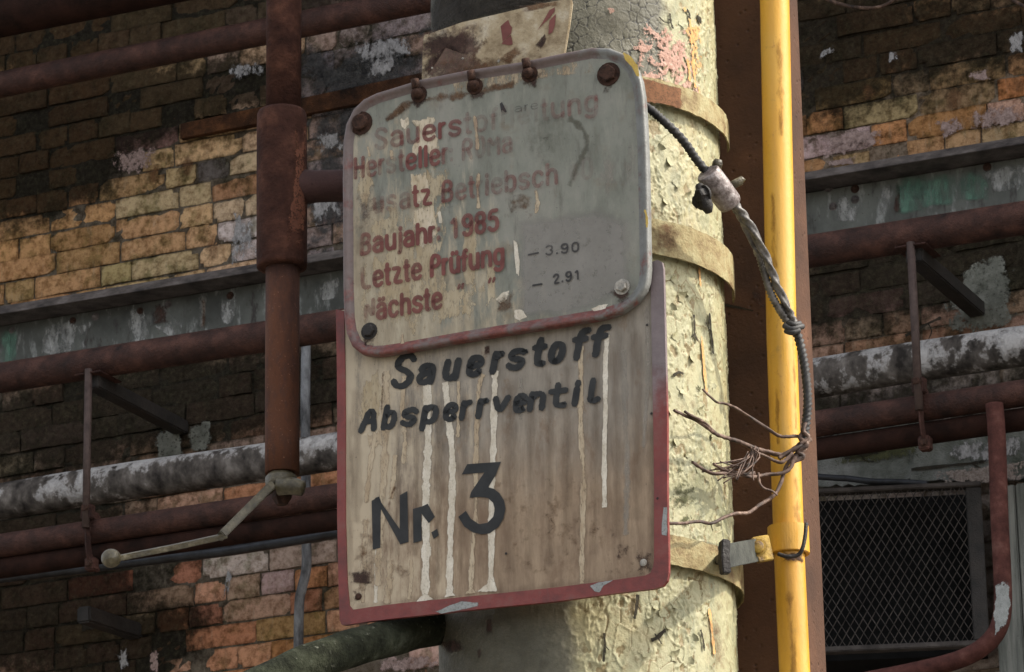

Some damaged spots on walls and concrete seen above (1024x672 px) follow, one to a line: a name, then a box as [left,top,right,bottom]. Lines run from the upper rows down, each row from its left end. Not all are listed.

efflorescence [356,38,410,76]
peeling [633,7,702,93]
peeling [654,143,692,200]
peeling [666,267,702,312]
peeling [677,336,717,394]
peeling [669,437,706,537]
peeling [646,597,716,665]